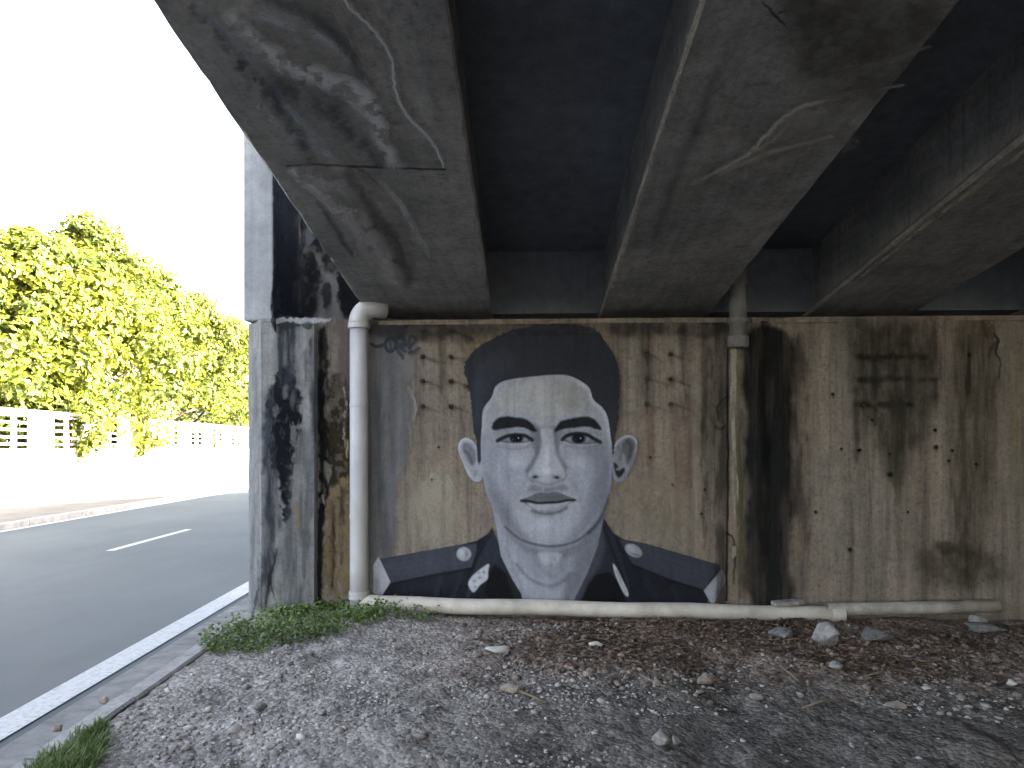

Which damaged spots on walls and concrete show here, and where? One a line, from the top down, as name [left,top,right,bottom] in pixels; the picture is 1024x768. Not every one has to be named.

leakage [202,0,396,166]
crack [286,0,446,171]
crack [691,46,929,185]
leakage [258,176,350,608]
leakage [702,322,804,605]